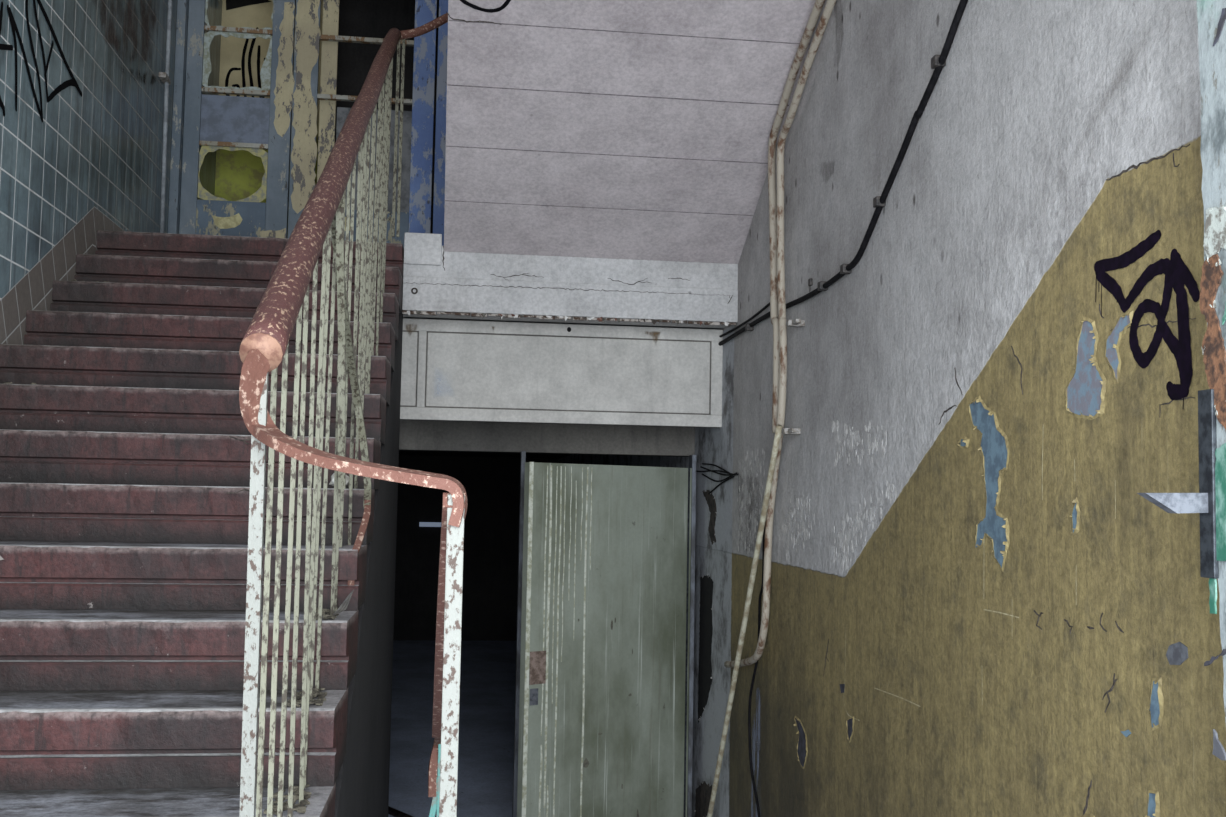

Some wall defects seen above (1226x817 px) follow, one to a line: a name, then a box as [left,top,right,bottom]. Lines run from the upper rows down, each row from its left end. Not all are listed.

peeling [1213,8,1226,46]
peeling [1203,205,1226,266]
peeling [1065,310,1133,420]
corrosion [1200,254,1226,430]
peeling [958,394,1010,572]
peeling [793,715,808,769]